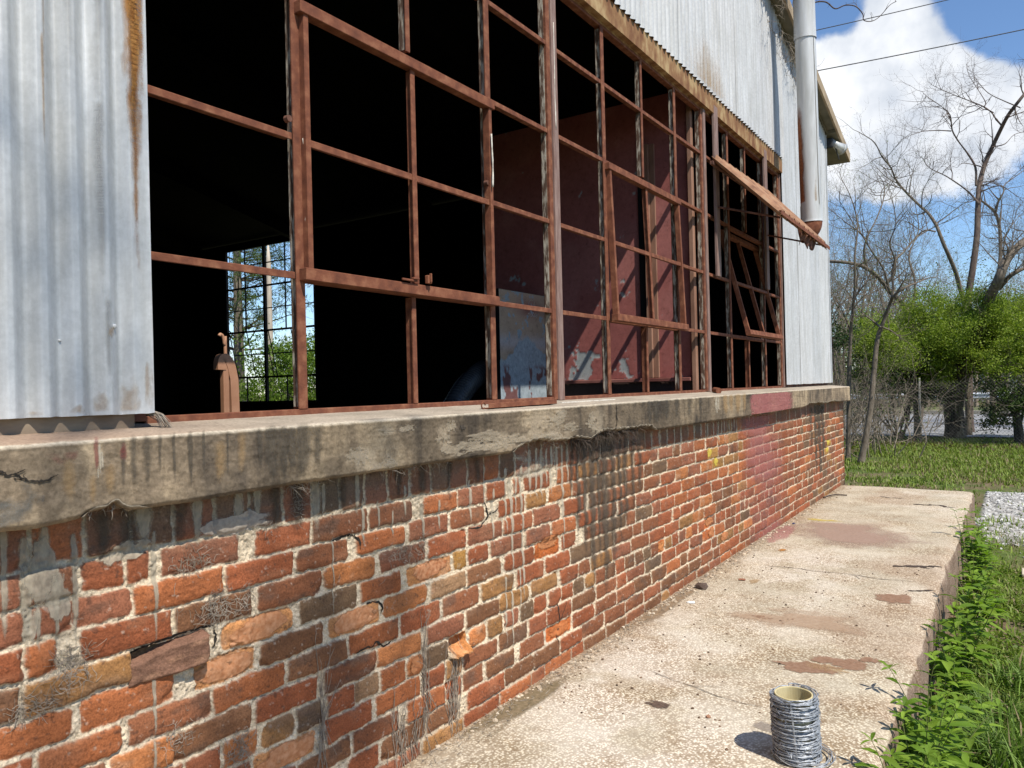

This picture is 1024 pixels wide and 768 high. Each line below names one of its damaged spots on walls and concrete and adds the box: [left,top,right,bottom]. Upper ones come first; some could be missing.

rust [125,0,142,179]
crack [0,469,58,483]
crack [468,502,498,529]
crack [332,534,361,550]
crack [131,625,217,654]
crack [356,636,396,654]
spalling [448,635,469,656]